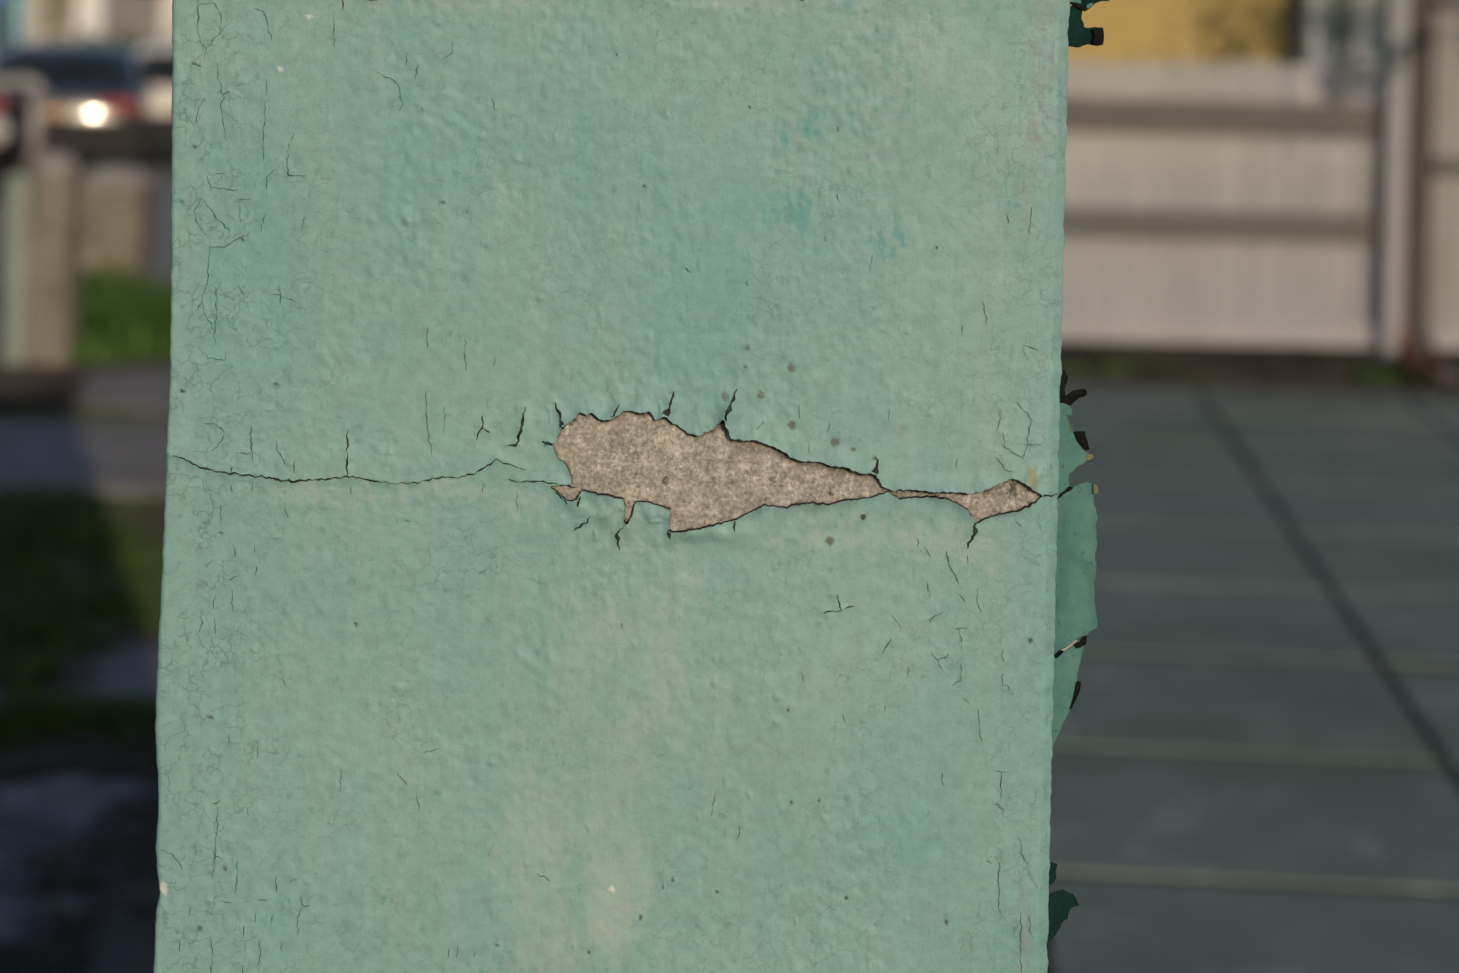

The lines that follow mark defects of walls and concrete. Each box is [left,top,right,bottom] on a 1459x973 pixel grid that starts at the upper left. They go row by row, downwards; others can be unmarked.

crack [191,1,306,361]
crack [377,42,453,114]
peeling [1068,0,1109,48]
crack [175,394,575,633]
peeling [542,370,1099,745]
peeling [1047,862,1079,943]